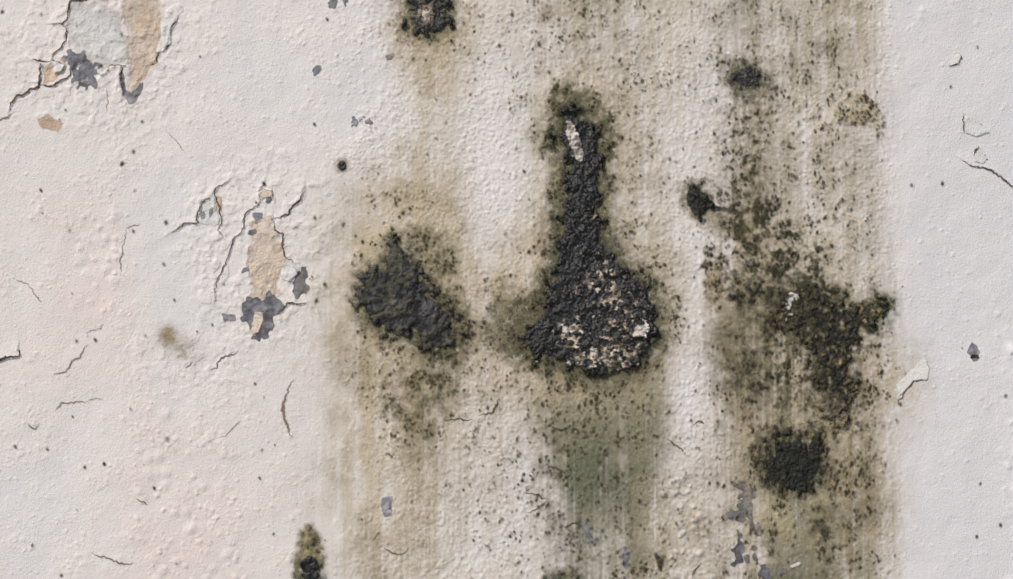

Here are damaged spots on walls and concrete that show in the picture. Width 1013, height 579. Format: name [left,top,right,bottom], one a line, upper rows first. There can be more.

peeling [9,0,178,108]
damp [400,0,457,73]
damp [532,0,619,70]
damp [771,1,842,108]
peeling [39,115,62,131]
crack [964,161,1013,187]
peeling [172,181,309,342]
damp [338,72,689,568]
damp [682,46,904,579]
peeling [896,357,929,404]
damp [293,524,324,579]